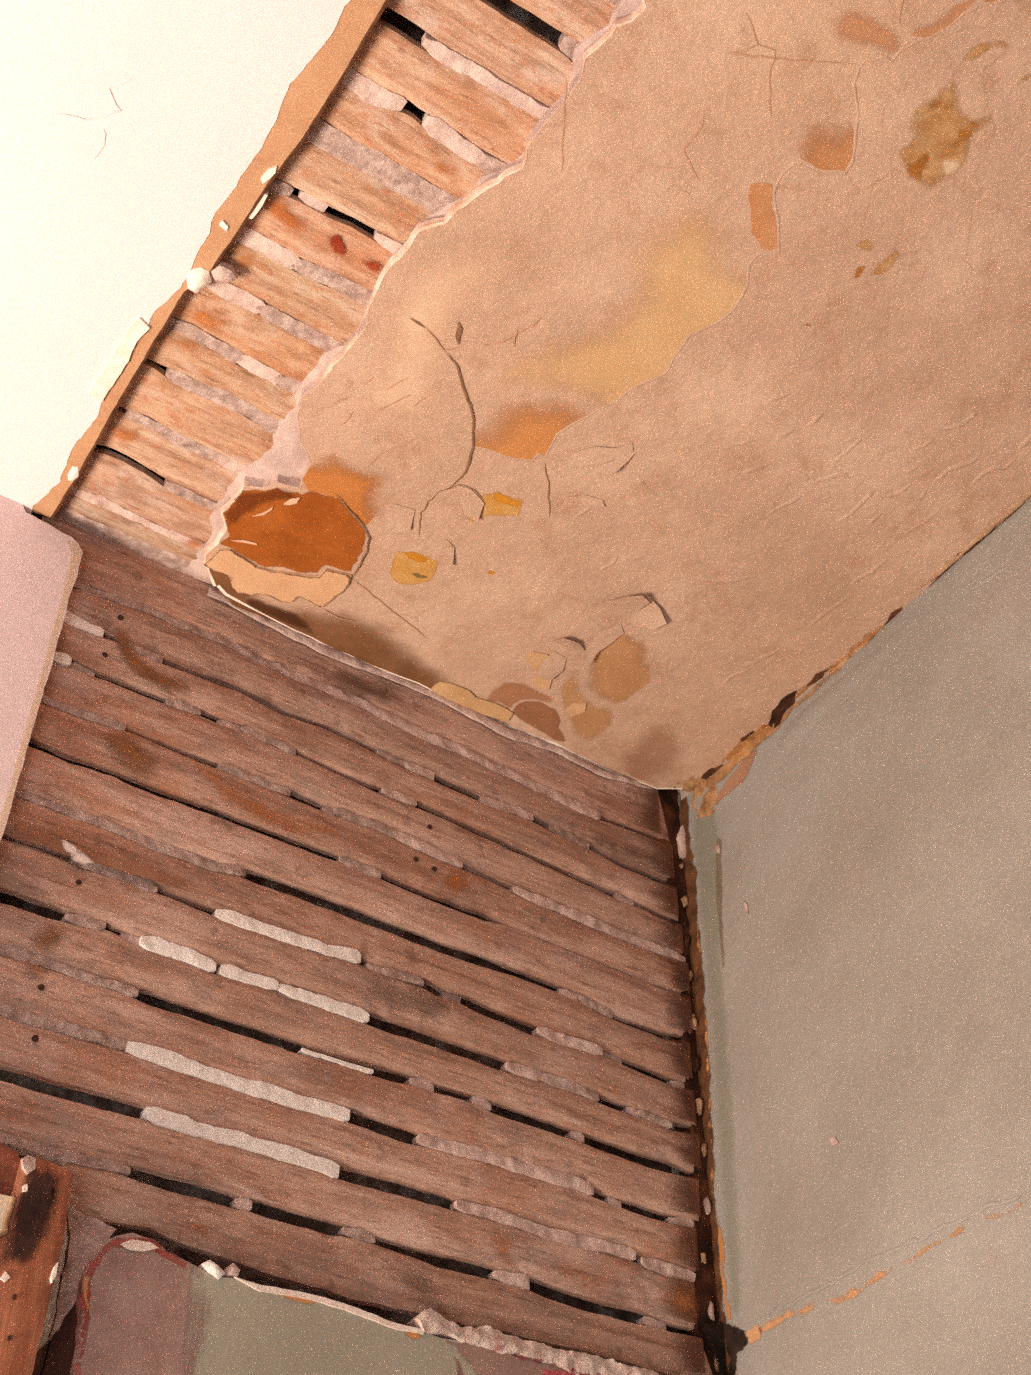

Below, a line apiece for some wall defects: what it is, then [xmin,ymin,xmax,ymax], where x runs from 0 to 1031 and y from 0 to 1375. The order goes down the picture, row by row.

crack [560,77,568,172]
crack [728,14,852,112]
peeling [474,0,1021,462]
flaking render [68,466,79,481]
flaking render [90,317,150,402]
water stain [374,271,472,407]
flaking render [181,0,756,818]
crack [410,318,540,532]
crack [544,465,552,518]
water stain [518,227,746,404]
crack [657,489,1031,1375]
flaking render [75,1238,659,1375]